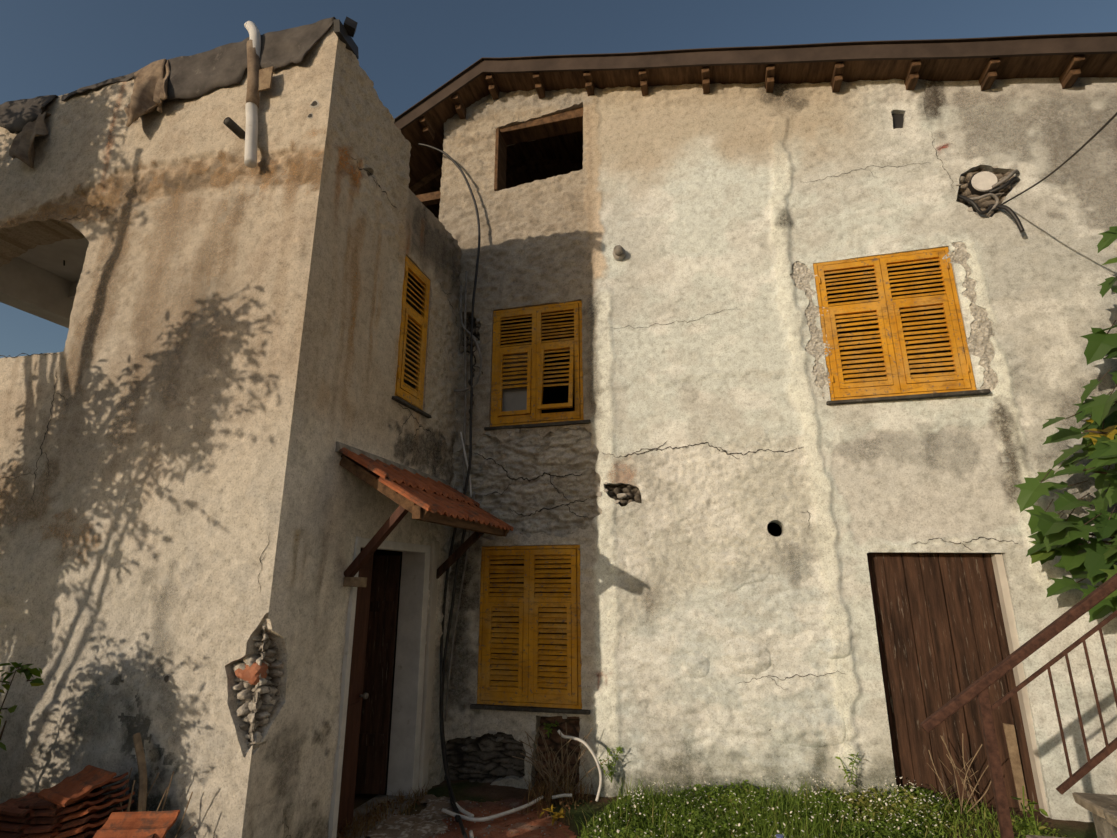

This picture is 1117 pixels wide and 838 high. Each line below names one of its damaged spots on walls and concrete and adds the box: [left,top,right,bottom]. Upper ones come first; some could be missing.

flaking render [790,262,831,399]
flaking render [942,242,999,391]
crack [602,441,803,459]
spalling [232,612,284,755]
spalling [444,713,581,790]